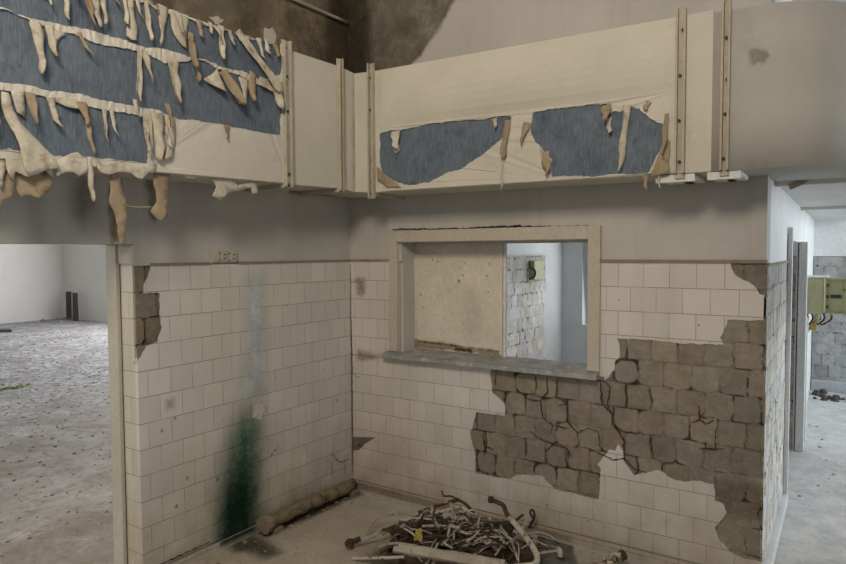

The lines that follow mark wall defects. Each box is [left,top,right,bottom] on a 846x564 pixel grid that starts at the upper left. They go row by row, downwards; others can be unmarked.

peeling [0,0,287,201]
peeling [377,116,511,192]
peeling [520,100,670,189]
spalling [135,266,162,360]
crack [527,378,647,474]
spalling [471,255,796,564]
crack [691,406,724,450]
leakage [225,484,278,556]
leakage [280,493,360,528]